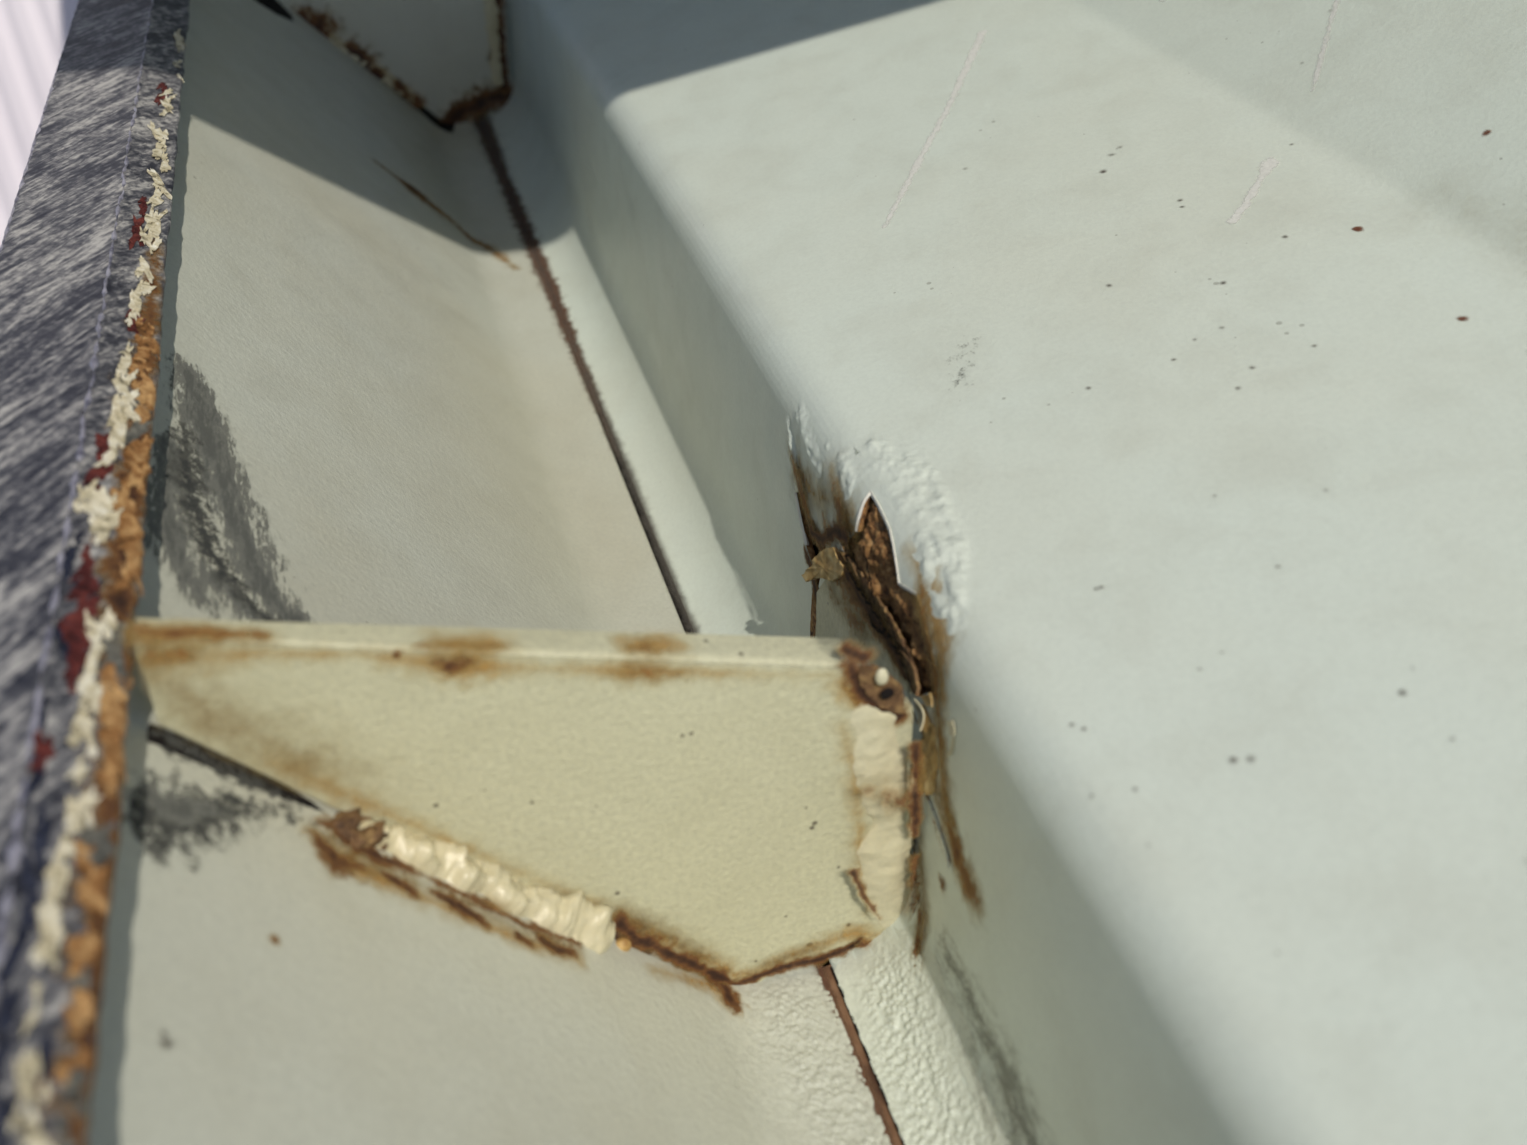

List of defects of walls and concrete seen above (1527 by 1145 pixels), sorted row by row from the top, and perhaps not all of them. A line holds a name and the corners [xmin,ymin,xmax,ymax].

rust [292,5,427,109]
rust [112,241,163,525]
rust [375,161,514,268]
rust [437,0,697,634]
peeling [0,29,316,1145]
rust [94,530,270,703]
rust [393,643,494,675]
rust [790,455,981,967]
rust [52,727,125,1145]
rust [310,817,580,958]
rust [612,910,903,1145]